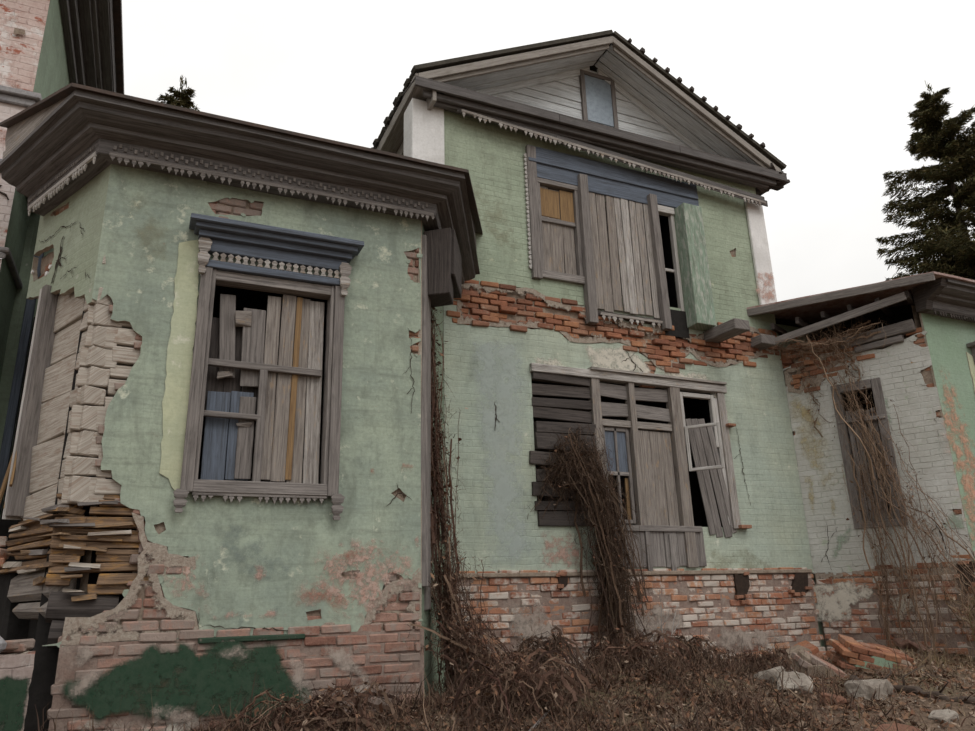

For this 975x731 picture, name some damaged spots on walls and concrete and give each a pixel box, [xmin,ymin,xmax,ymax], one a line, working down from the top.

spalling [208,195,263,219]
crack [38,223,89,284]
peeling [587,346,707,380]
spalling [784,348,875,394]
water stain [944,387,975,541]
spalling [56,509,199,648]
spalling [302,540,423,637]
spalling [788,551,975,596]
spalling [0,638,35,654]